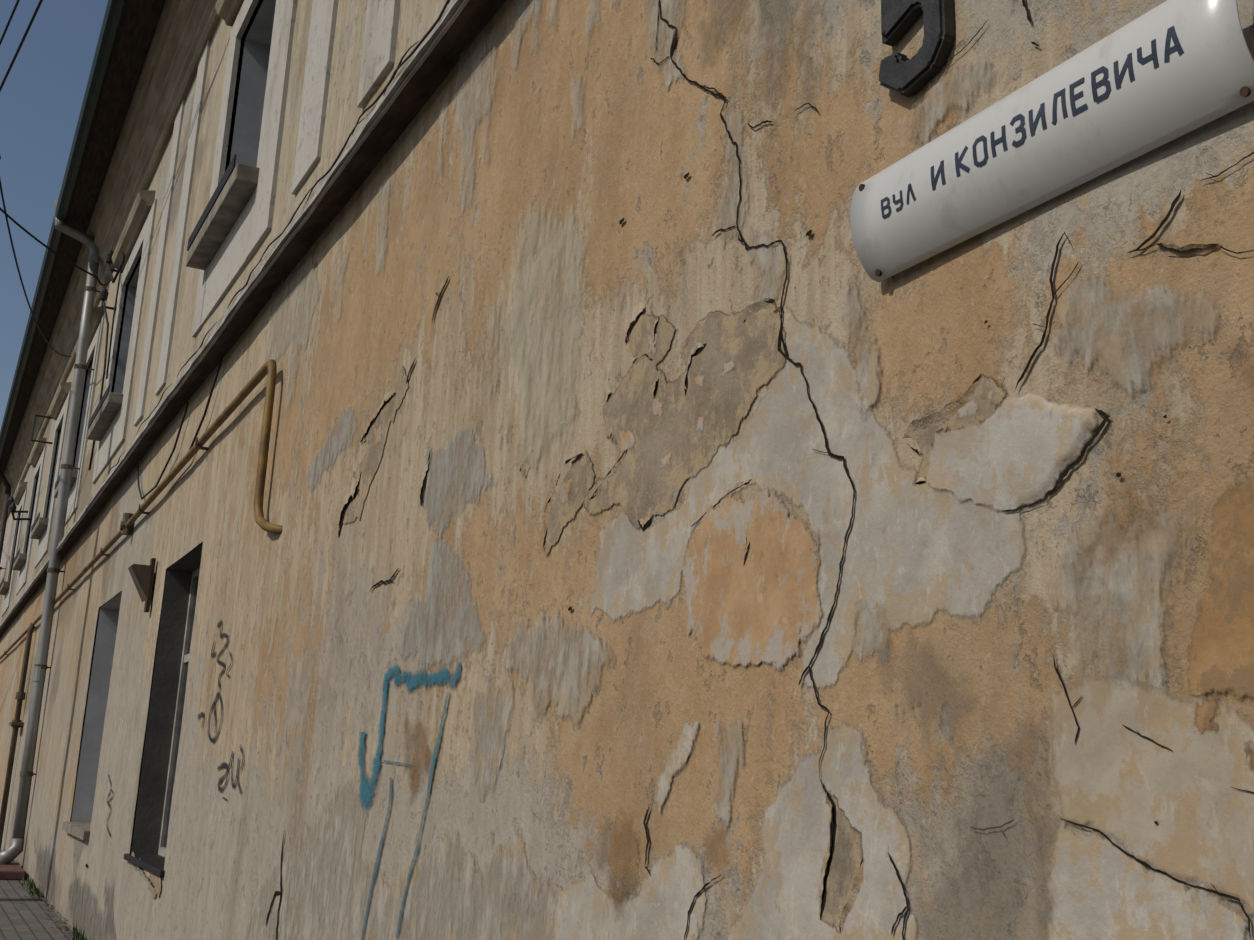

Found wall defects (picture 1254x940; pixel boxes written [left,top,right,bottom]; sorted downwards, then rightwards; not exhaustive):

crack [1127,151,1254,257]
crack [432,276,449,322]
crack [1015,232,1079,390]
flaking render [505,107,1026,727]
crack [651,0,909,940]
flaking render [1046,508,1254,940]
crack [642,806,650,875]
crack [1061,818,1251,937]